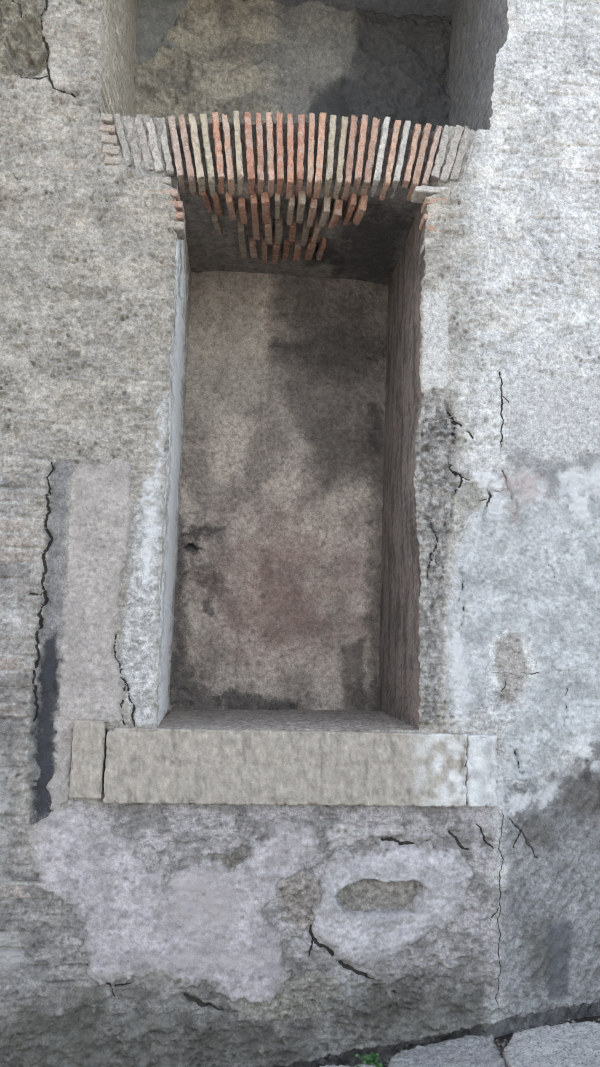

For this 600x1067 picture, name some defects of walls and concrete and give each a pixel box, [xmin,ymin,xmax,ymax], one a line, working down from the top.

crack [0,0,76,98]
crack [447,372,516,516]
leakage [40,634,57,692]
leakage [445,616,471,730]
leakage [494,734,600,814]
crack [308,919,373,979]
crack [381,813,538,1009]
leakage [548,924,571,997]